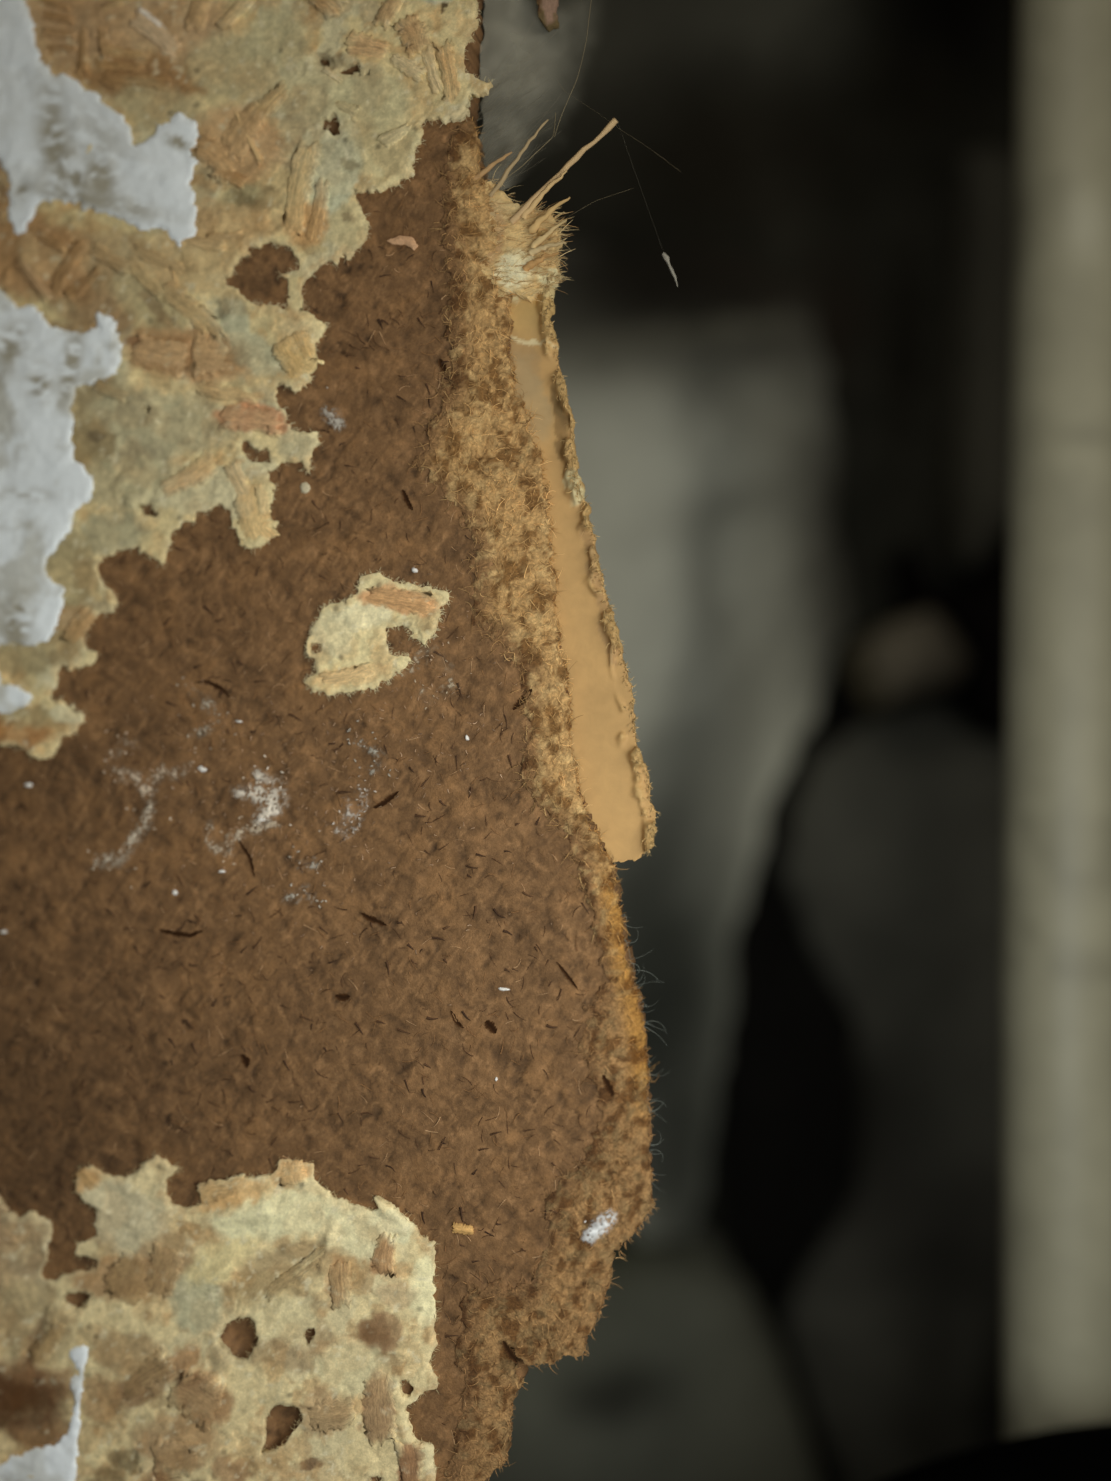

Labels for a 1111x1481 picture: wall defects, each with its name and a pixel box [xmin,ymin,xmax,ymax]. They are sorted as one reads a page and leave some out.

peeling [0,678,33,718]
peeling [0,291,126,648]
peeling [506,201,661,863]
peeling [0,1345,88,1481]